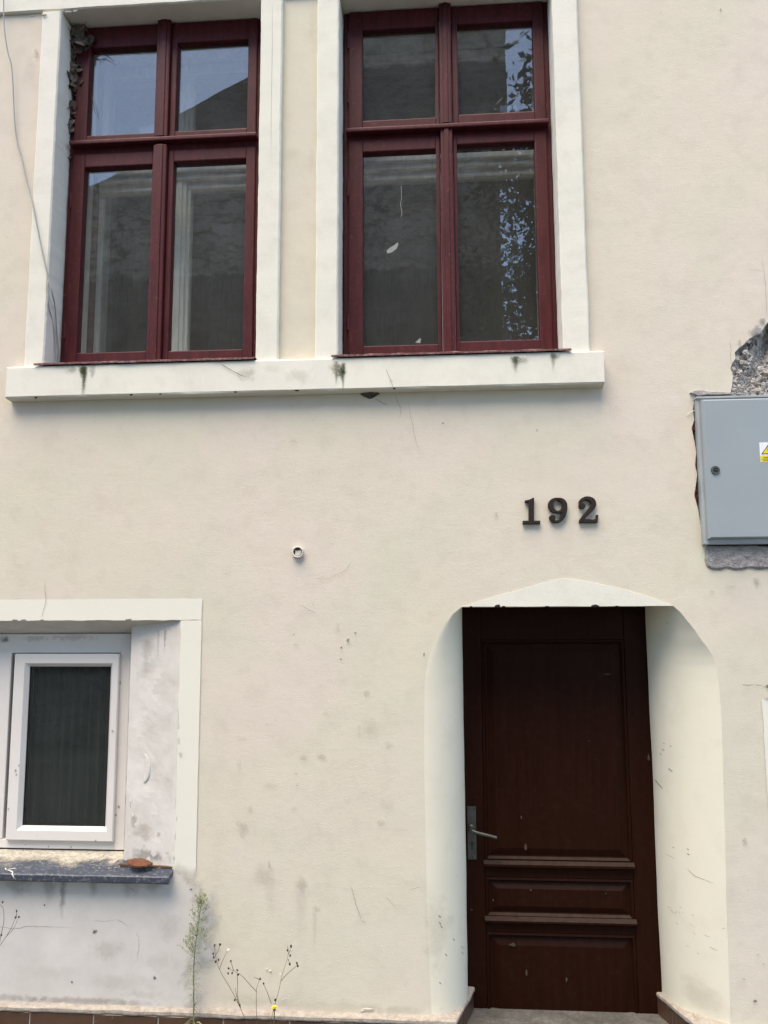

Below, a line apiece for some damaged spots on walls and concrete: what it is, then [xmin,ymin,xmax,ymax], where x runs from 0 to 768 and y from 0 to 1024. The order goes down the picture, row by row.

flaking render [690,323,768,518]